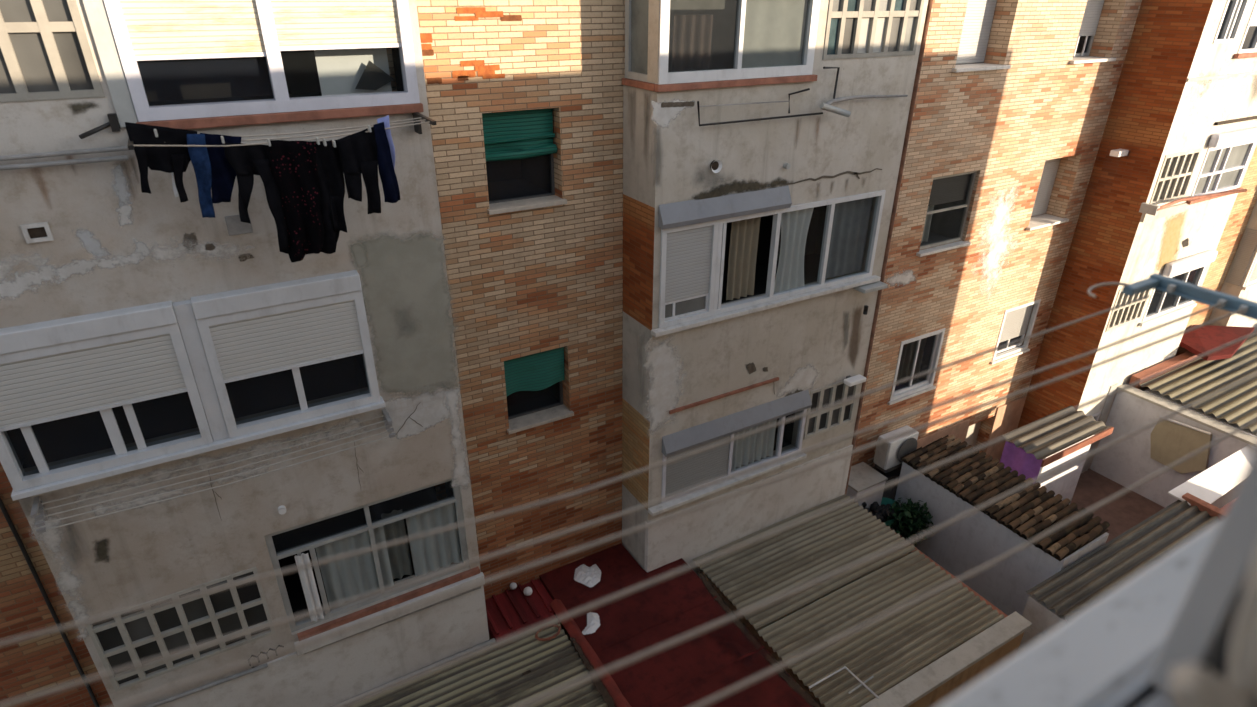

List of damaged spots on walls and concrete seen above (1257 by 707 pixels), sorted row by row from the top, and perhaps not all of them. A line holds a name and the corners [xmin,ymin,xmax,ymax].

peeling [113,166,132,226]
crack [781,168,882,185]
peeling [0,230,254,299]